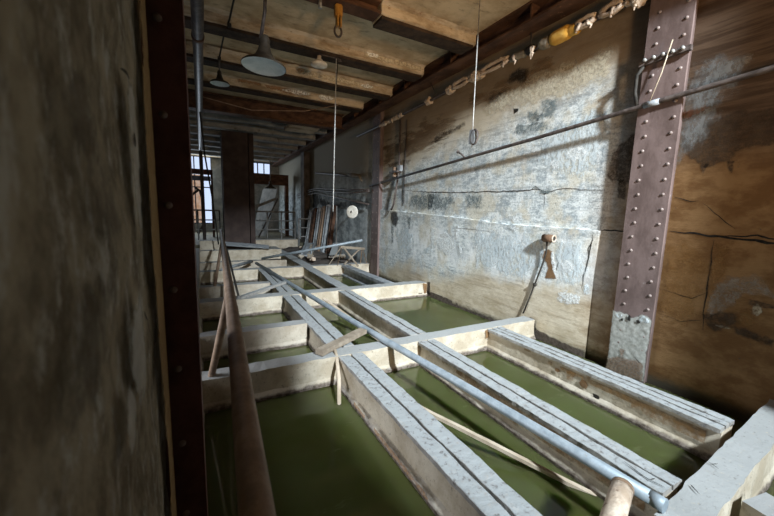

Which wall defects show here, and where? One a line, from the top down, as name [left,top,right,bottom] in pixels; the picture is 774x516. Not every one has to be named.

water stain [608,134,635,199]
water stain [411,194,453,210]
crack [407,186,587,204]
crack [582,230,623,286]
crack [664,197,774,325]